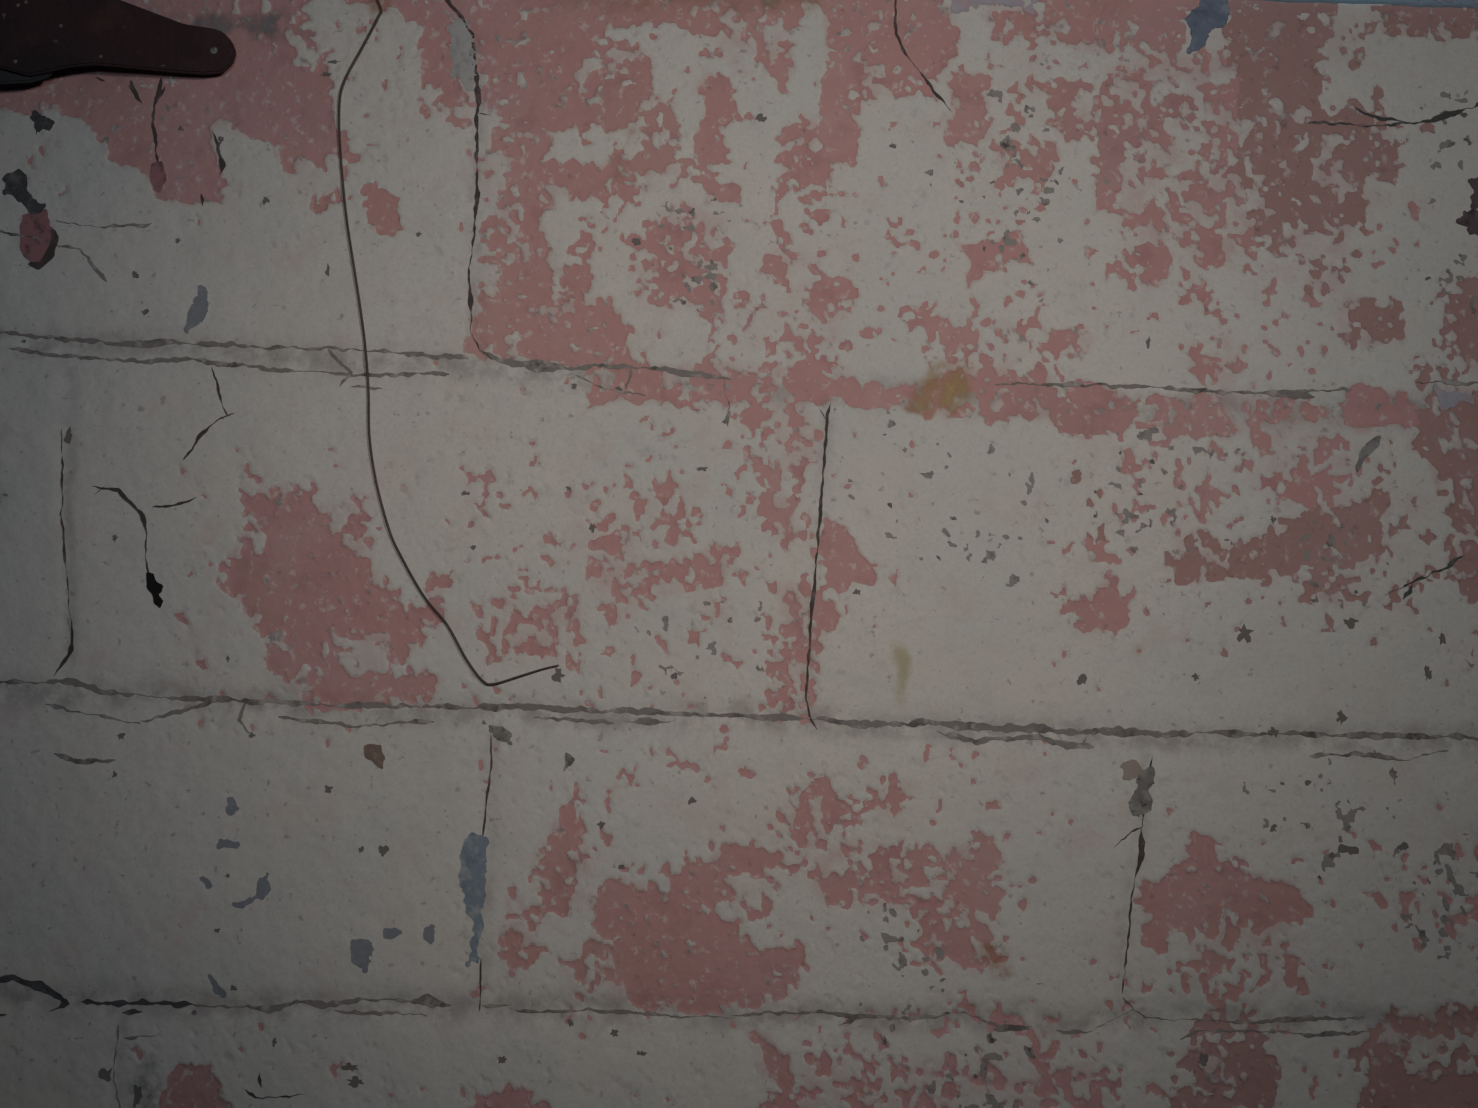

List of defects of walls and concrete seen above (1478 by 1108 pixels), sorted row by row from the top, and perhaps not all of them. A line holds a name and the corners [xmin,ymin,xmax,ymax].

peeling [0,0,422,269]
crack [0,0,732,460]
peeling [184,0,1478,732]
crack [995,381,1352,399]
crack [1418,378,1478,386]
spalling [146,572,188,625]
spalling [364,744,385,769]
crack [0,404,1478,1108]
spalling [1120,759,1173,816]
peeling [350,928,402,973]
peeling [458,747,1123,1108]
peeling [1105,830,1478,1108]